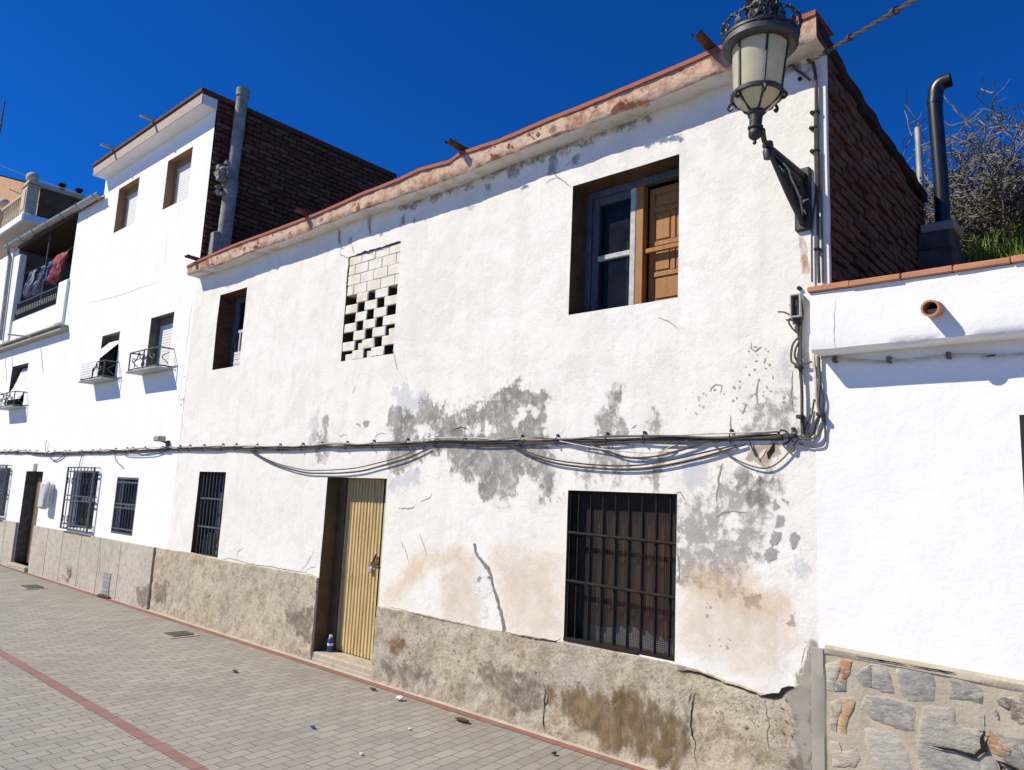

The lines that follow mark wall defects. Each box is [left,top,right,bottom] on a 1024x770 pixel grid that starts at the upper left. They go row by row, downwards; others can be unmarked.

damp [482,133,603,190]
peeling [387,378,555,503]
peeling [576,390,666,493]
peeling [676,346,801,609]
crack [386,543,560,642]
damp [408,665,690,770]
crack [678,646,807,769]
crack [922,725,1019,770]